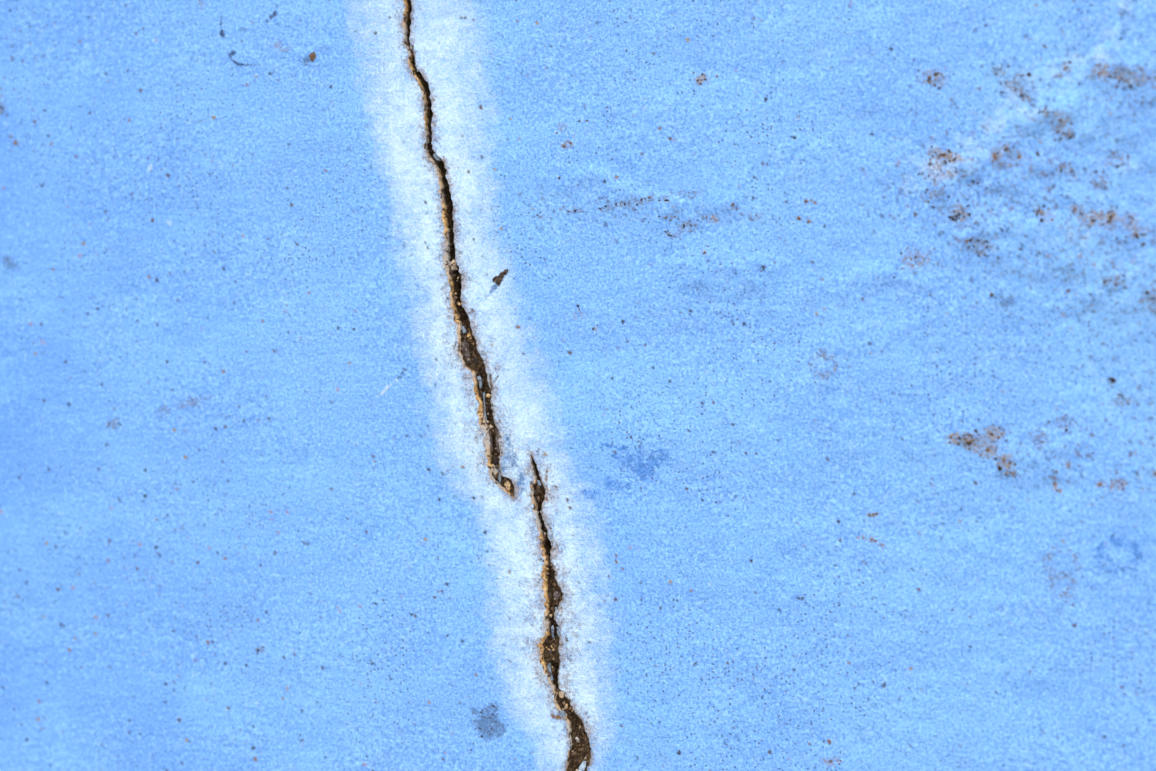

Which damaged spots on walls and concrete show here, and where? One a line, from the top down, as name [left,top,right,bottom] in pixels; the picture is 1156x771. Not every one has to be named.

water stain [338,0,622,771]
crack [389,0,601,771]